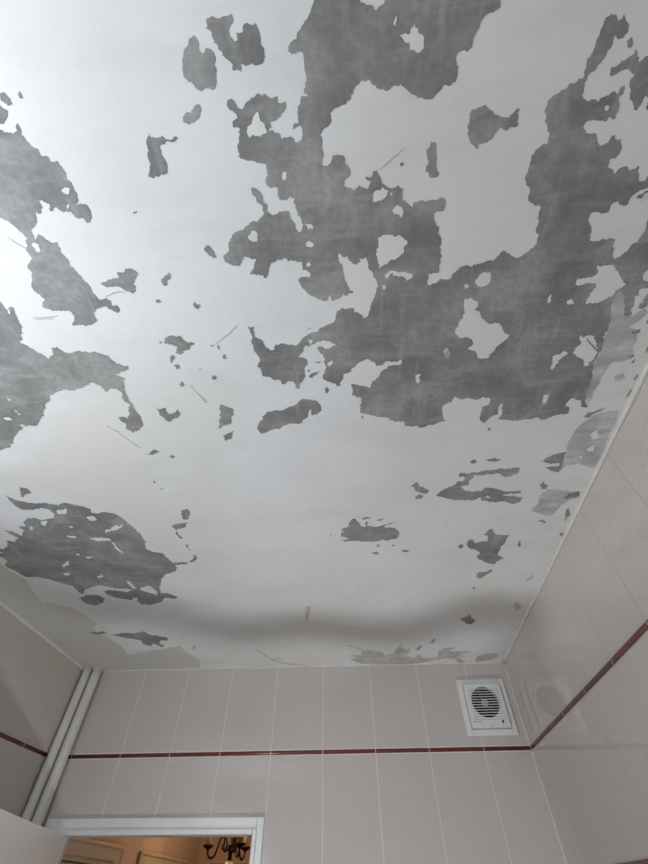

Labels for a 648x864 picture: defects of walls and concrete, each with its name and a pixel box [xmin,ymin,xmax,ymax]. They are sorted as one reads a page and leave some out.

peeling [182,14,266,91]
peeling [183,104,201,124]
peeling [146,134,178,178]
peeling [0,91,138,326]
peeling [204,0,648,434]
peeling [0,302,144,450]
peeling [412,458,522,504]
peeling [0,487,197,605]
peeling [330,516,409,554]
peeling [458,529,510,590]
peeling [91,631,168,647]